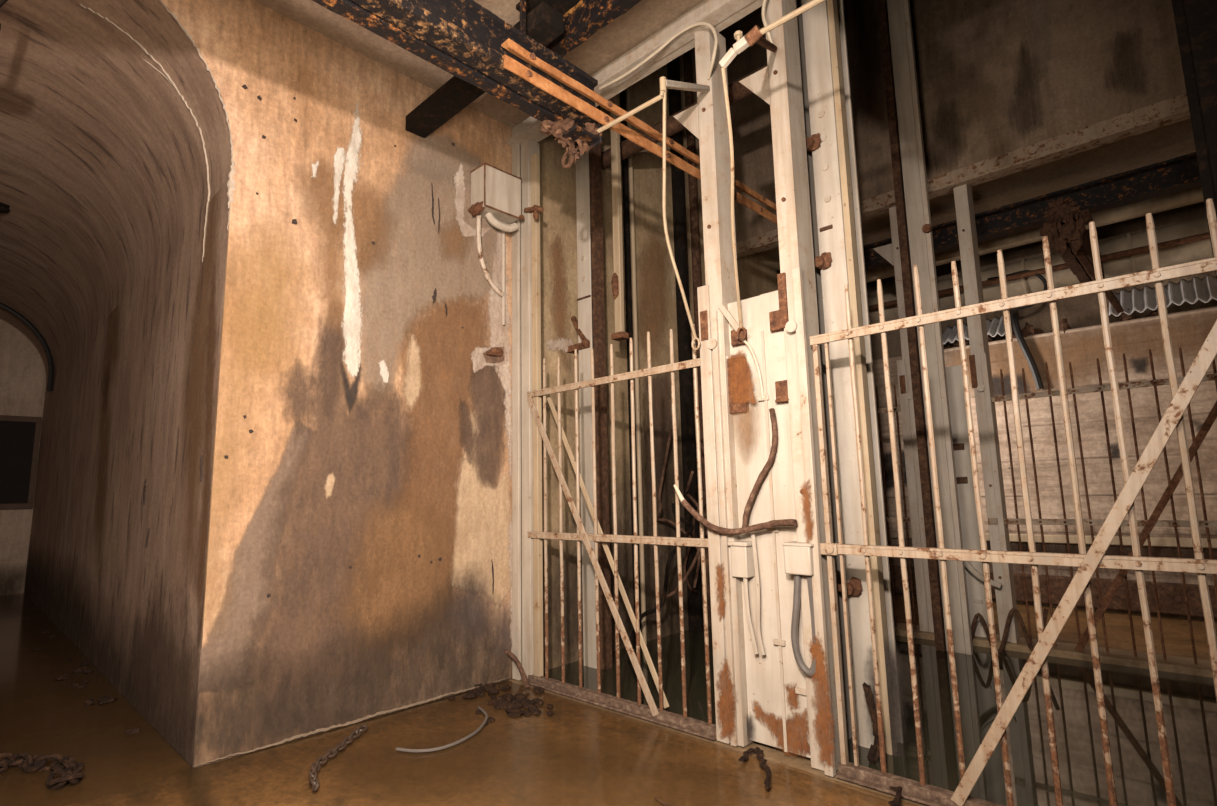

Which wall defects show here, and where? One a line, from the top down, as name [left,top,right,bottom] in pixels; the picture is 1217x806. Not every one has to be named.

damp [0,102,512,767]
peeling [418,163,512,652]
rust [729,352,756,448]
rust [801,482,813,543]
rust [716,564,726,619]
rust [716,637,834,766]